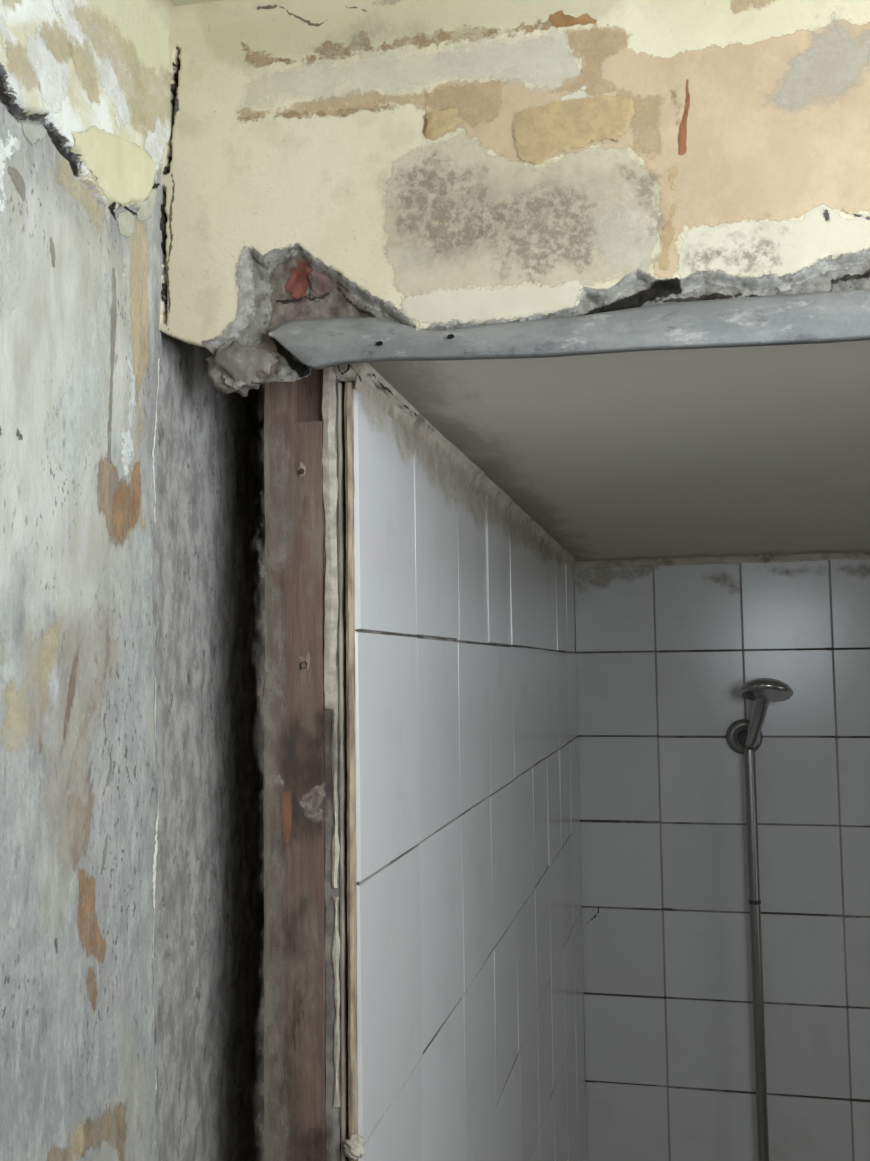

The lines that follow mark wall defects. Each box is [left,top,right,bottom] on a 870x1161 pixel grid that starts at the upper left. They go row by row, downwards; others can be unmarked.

crack [257,5,366,27]
peeling [731,0,774,13]
crack [0,63,82,177]
peeling [0,0,173,237]
crack [160,46,180,330]
damp [384,132,660,298]
corrosion [672,80,690,155]
peeling [202,20,870,1107]